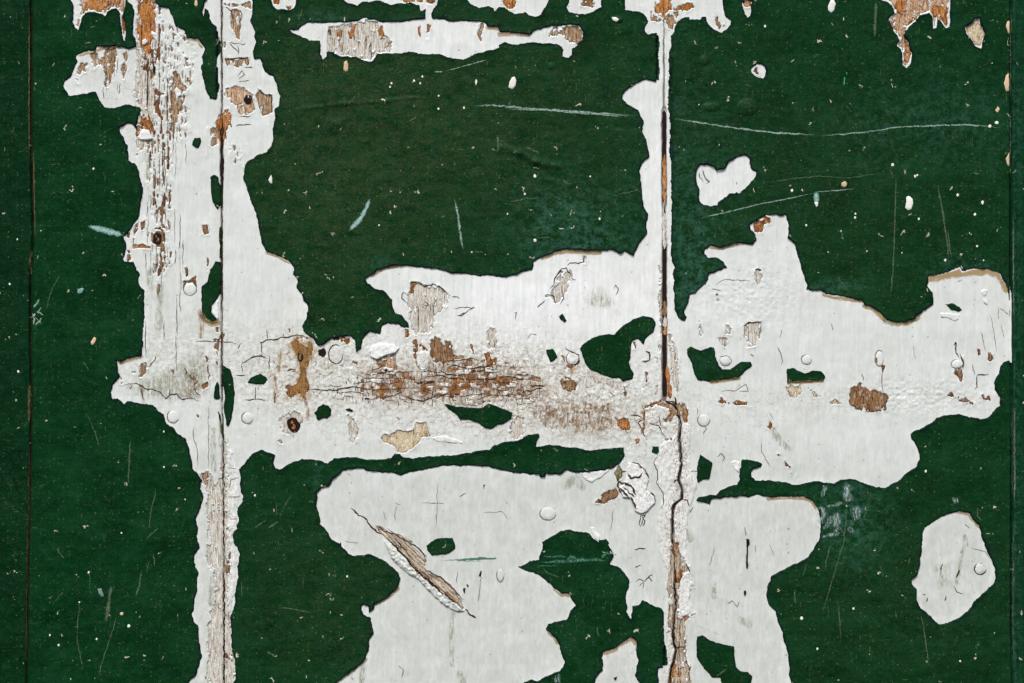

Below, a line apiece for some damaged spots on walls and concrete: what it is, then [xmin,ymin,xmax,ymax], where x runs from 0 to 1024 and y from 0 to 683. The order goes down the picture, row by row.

peeling [290,0,601,72]
peeling [665,0,731,33]
crack [660,52,668,214]
peeling [696,155,756,206]
crack [401,281,474,332]
crack [515,256,587,336]
crack [718,321,783,364]
crack [311,358,544,406]
crack [609,246,725,683]
peeling [189,482,220,683]
peeling [912,511,995,624]
peeling [595,637,639,683]